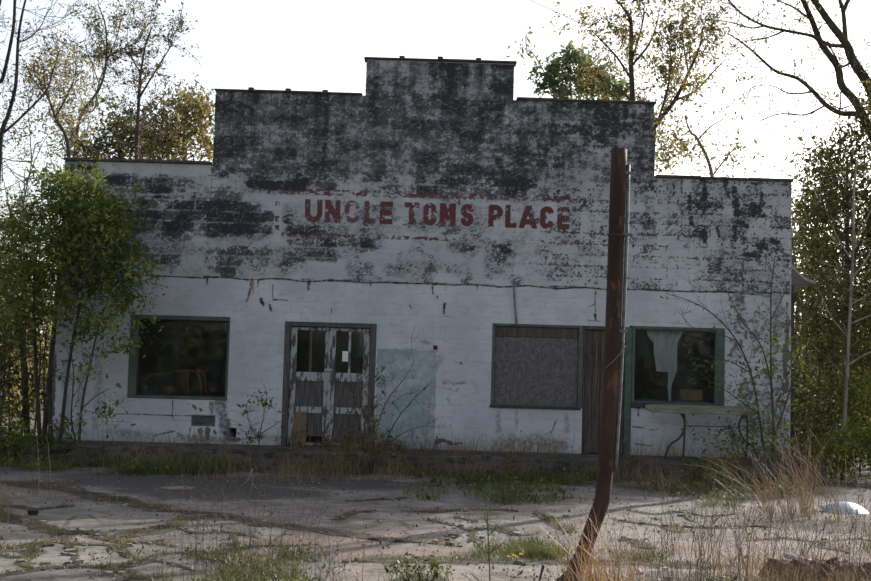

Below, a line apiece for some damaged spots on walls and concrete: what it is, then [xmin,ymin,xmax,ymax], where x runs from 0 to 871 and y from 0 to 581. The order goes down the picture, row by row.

water stain [214,60,654,206]
water stain [120,218,280,279]
water stain [673,245,750,293]